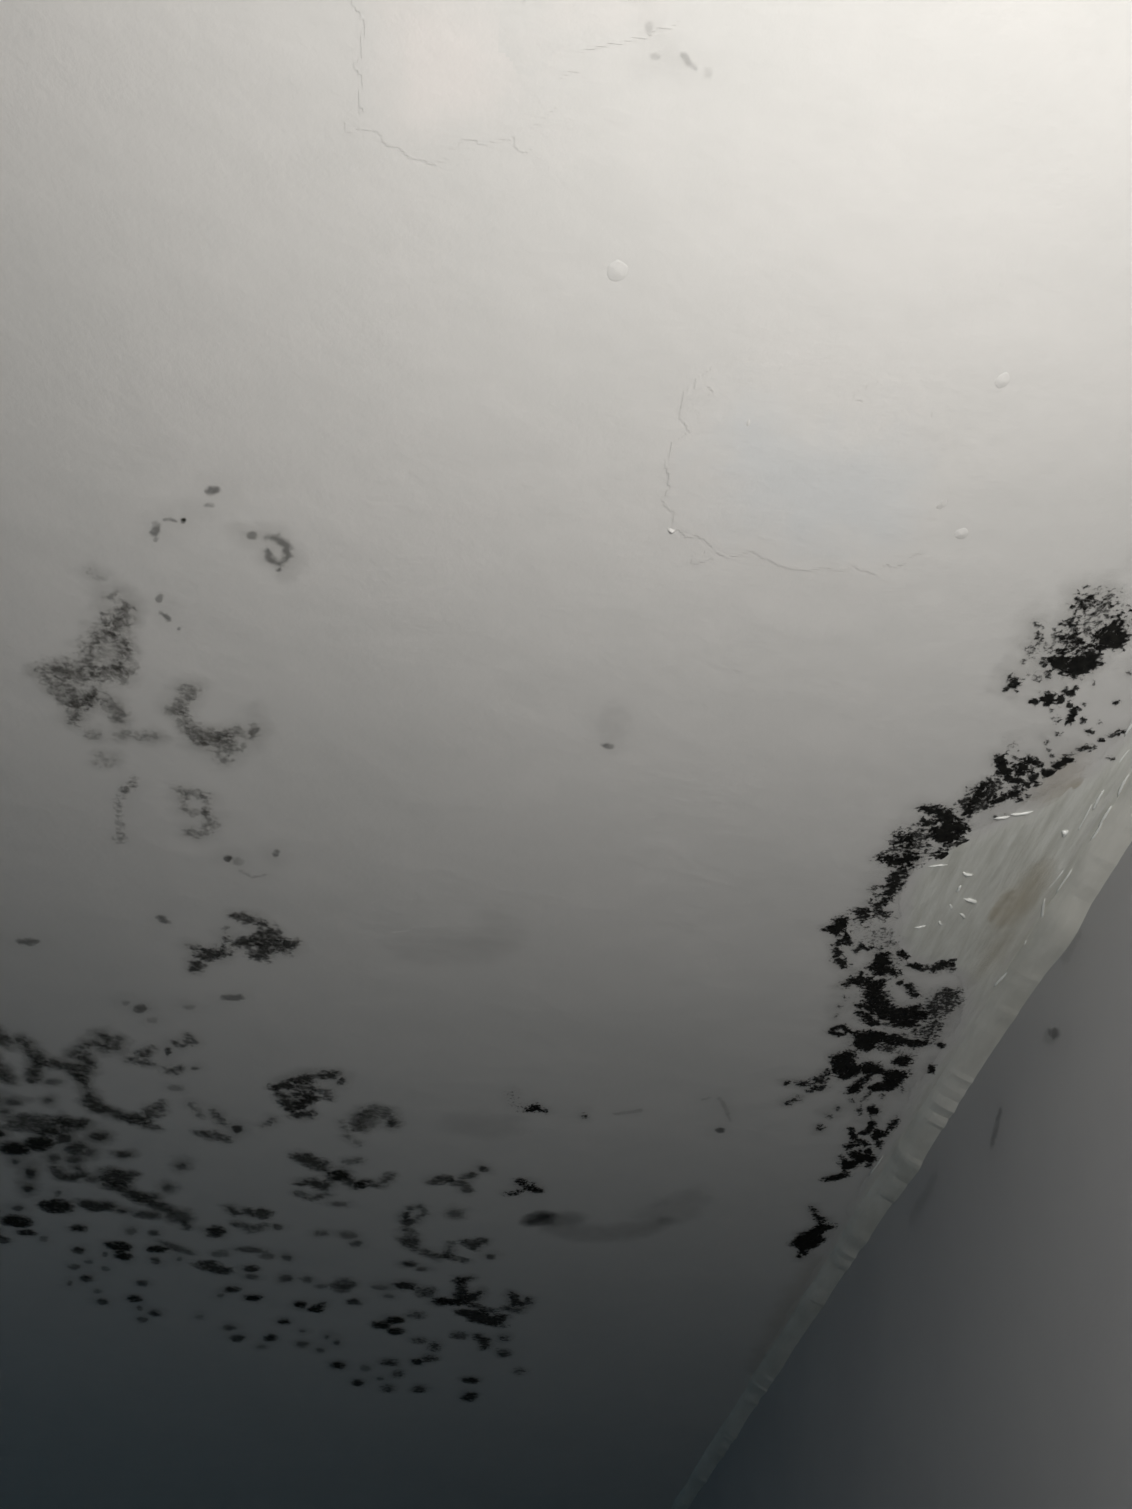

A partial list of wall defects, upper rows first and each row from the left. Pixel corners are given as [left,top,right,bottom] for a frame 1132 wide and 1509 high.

mould [784,585,1132,1182]
mould [190,913,299,972]
mould [268,1071,344,1123]
mould [0,1035,189,1254]
damp [290,1153,390,1198]
damp [506,1178,543,1196]
mould [104,1242,168,1264]
damp [207,1207,270,1237]
mould [788,1206,837,1258]
damp [199,1261,262,1301]
mould [394,1207,533,1357]
damp [373,1317,436,1393]